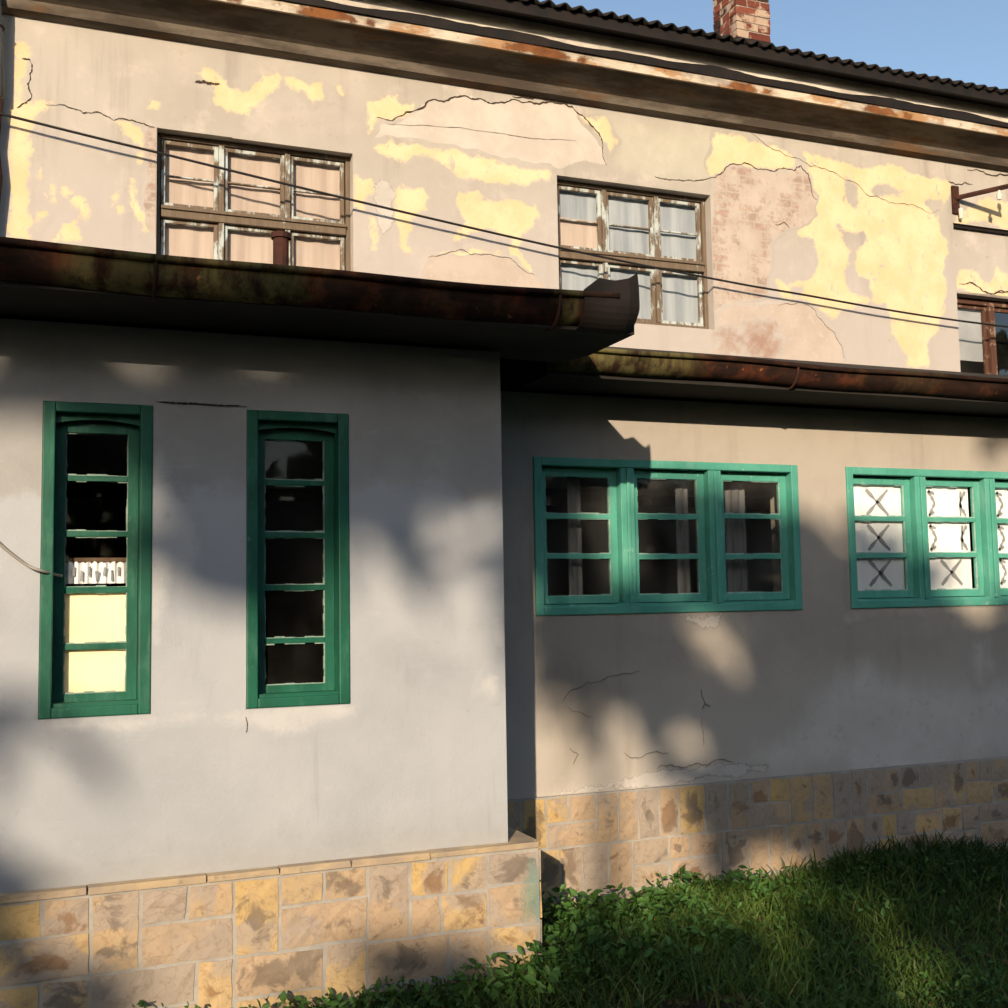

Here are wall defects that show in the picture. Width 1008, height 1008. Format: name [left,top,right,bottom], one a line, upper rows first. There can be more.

rust [297,6,375,27]
rust [505,42,587,63]
rust [730,80,771,94]
peeling [0,29,160,247]
crack [46,104,155,128]
crack [377,95,605,161]
rust [864,105,911,119]
spalling [189,61,622,289]
crack [655,133,925,211]
peeling [704,127,1008,370]
crack [960,282,1008,294]
spalling [559,763,768,795]